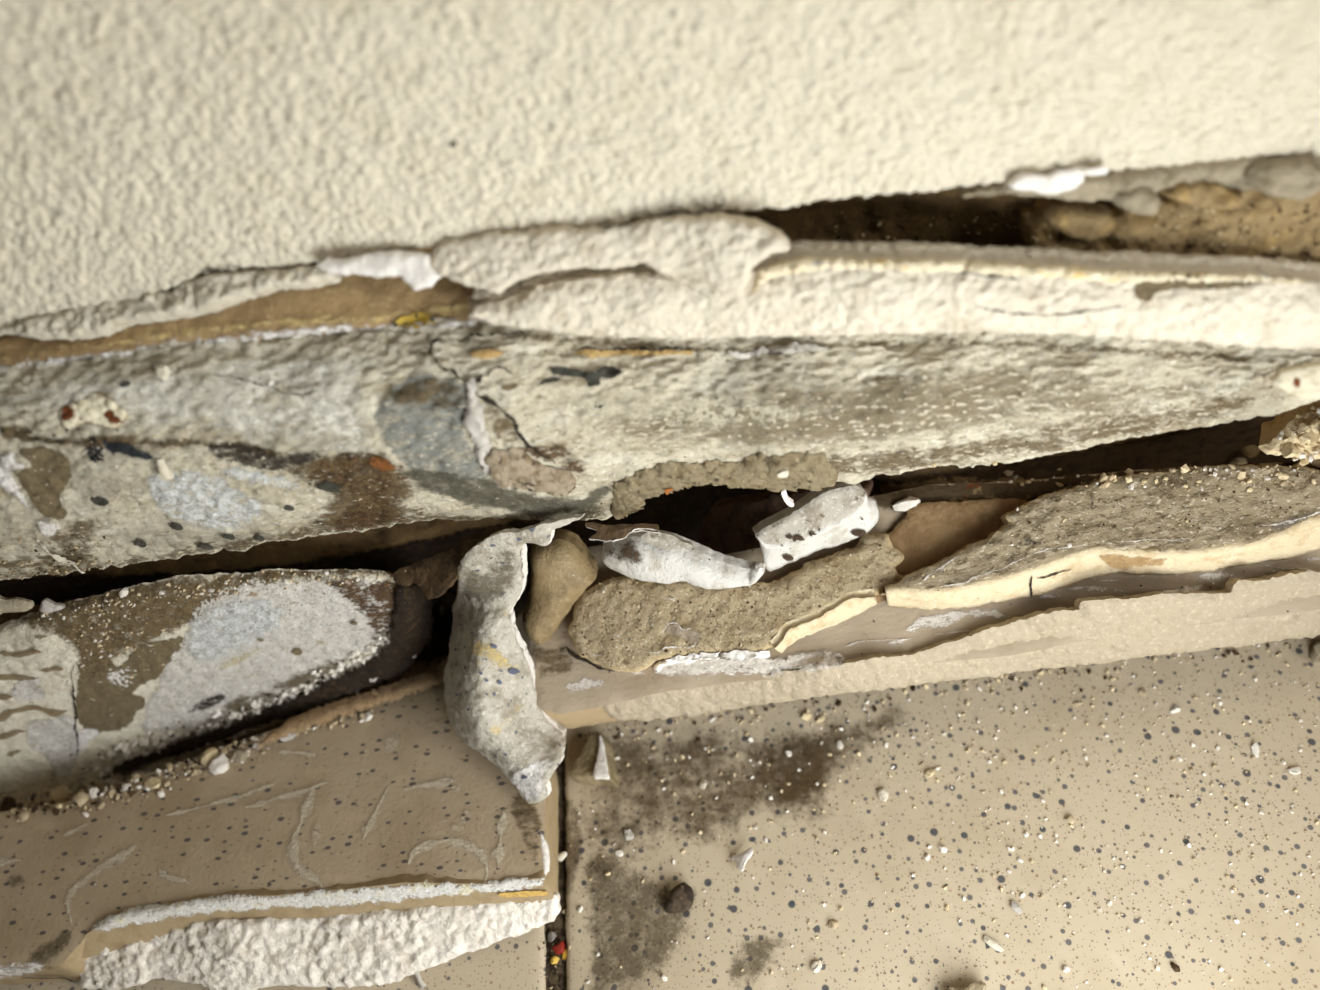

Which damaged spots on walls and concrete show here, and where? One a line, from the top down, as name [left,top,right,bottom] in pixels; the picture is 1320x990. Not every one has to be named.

crack [597,198,759,229]
crack [161,247,432,292]
peeling [0,152,1320,460]
crack [946,272,1129,316]
peeling [18,446,72,521]
flaking render [156,458,174,482]
peeling [777,467,794,507]
peeling [640,530,693,550]
flaking render [0,595,65,615]
spalling [770,513,1320,653]
peeling [76,636,183,733]
flaking render [201,747,249,775]